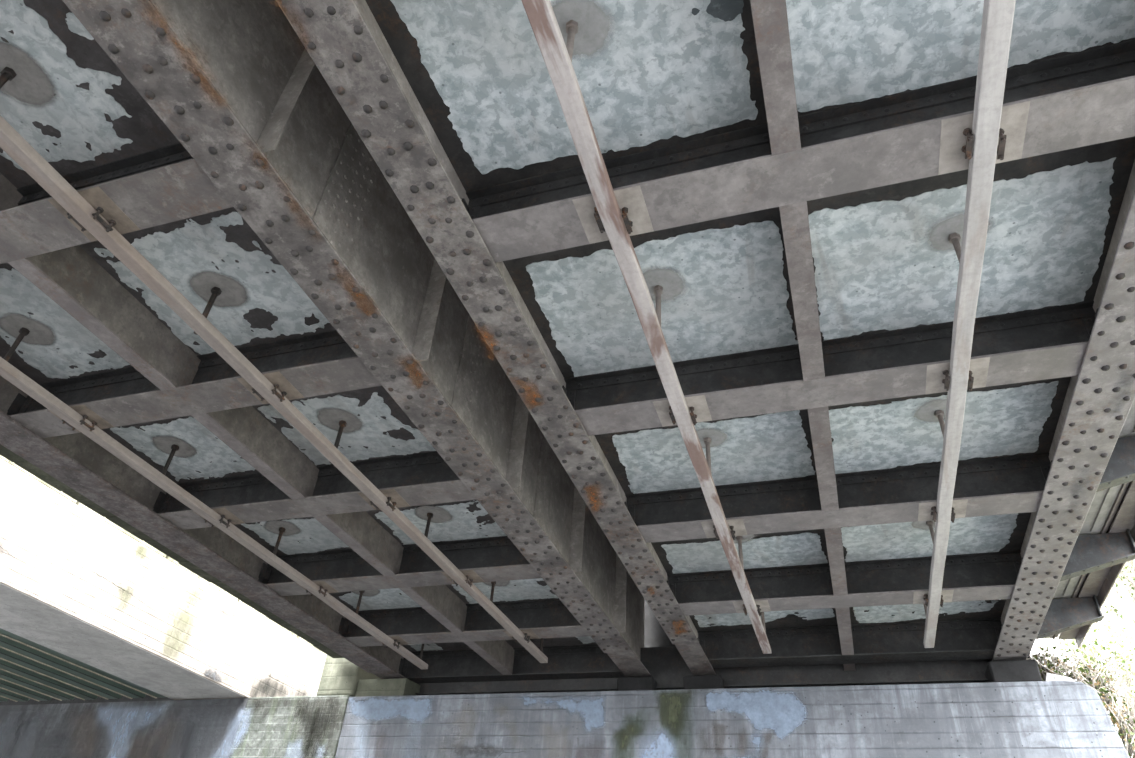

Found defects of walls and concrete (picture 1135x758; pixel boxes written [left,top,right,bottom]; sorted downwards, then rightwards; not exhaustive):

peeling [0,0,133,162]
peeling [390,0,578,174]
peeling [572,0,758,154]
peeling [94,248,215,355]
peeling [131,212,330,346]
peeling [258,405,331,465]
peeling [292,392,436,462]
leakage [615,723,638,751]
efflorescence [642,732,673,758]
flaking render [705,689,807,758]